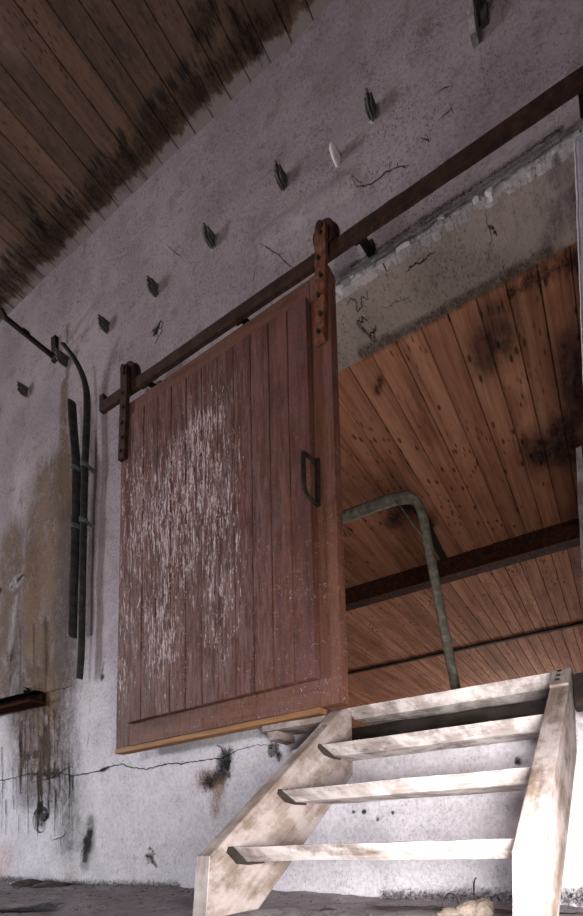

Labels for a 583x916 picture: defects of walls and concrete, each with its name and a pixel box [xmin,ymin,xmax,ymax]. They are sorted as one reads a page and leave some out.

damp [0,0,294,319]
spalling [335,121,583,375]
damp [509,253,578,298]
damp [0,368,81,849]
crack [0,744,279,792]